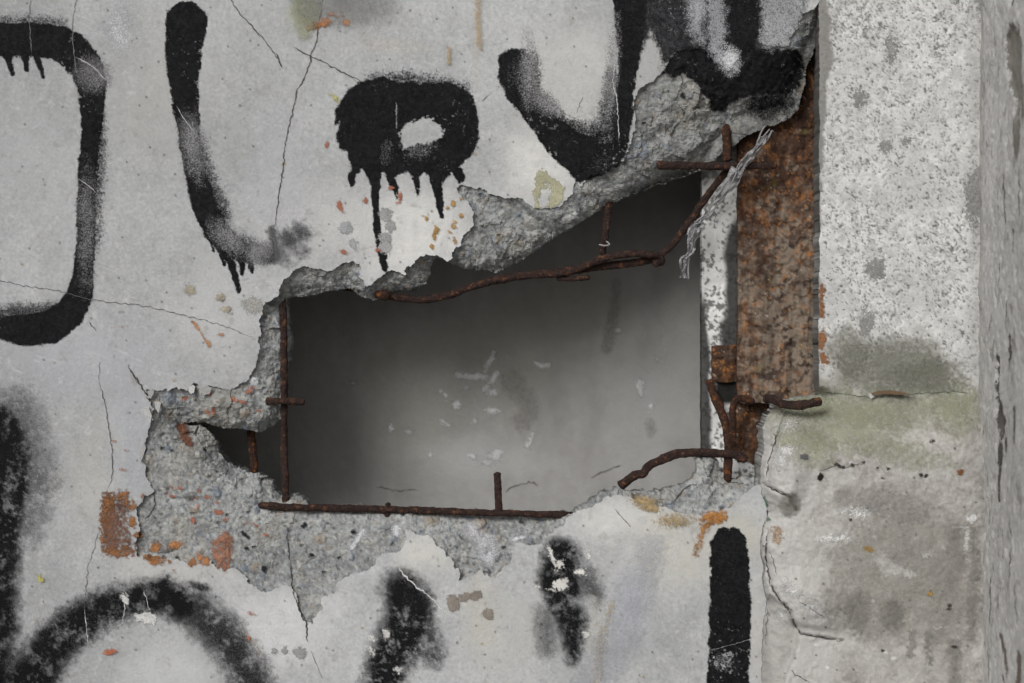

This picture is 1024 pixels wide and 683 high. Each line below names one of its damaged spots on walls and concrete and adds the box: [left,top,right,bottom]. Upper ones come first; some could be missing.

crack [231,0,361,256]
rust [425,198,463,249]
crack [0,280,252,337]
spalling [129,5,822,623]
crack [764,433,786,495]
rust [98,491,183,566]
crack [765,534,835,643]